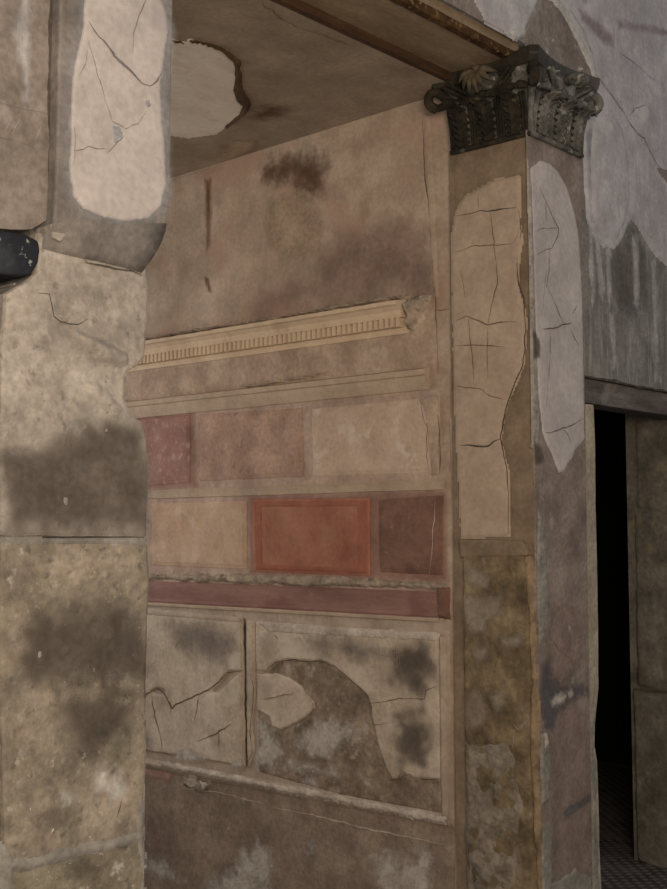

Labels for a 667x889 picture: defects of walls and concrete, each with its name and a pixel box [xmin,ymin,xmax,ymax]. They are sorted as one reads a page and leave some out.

crack [74,1,162,162]
peeling [170,38,251,139]
spalling [504,0,600,87]
crack [421,123,429,210]
crack [420,188,578,516]
leakage [588,224,661,384]
leakage [71,693,125,747]
crack [146,659,437,763]
spalling [255,660,442,813]
leakage [393,648,432,692]
leakage [399,722,426,764]
spalling [459,512,600,889]